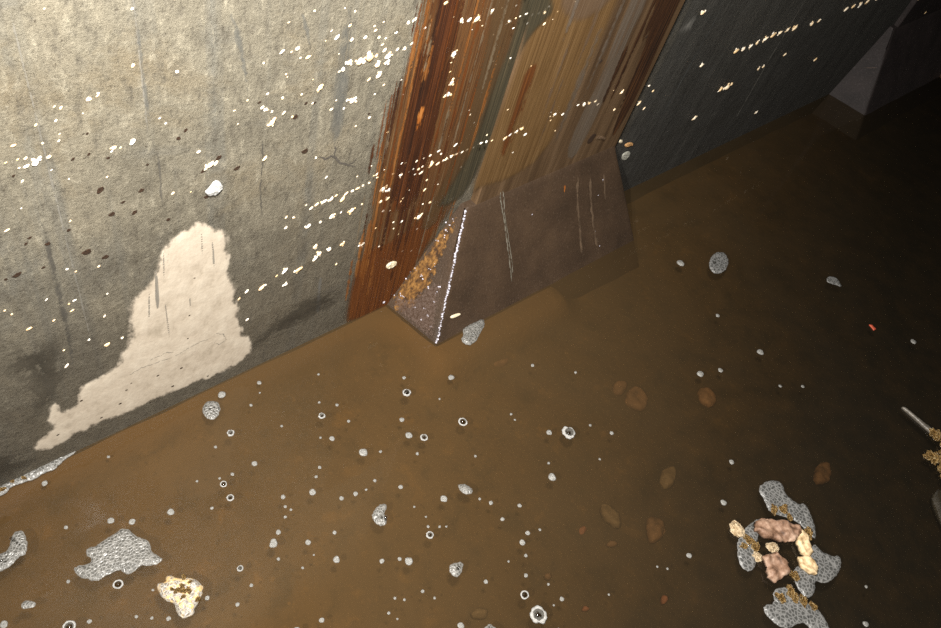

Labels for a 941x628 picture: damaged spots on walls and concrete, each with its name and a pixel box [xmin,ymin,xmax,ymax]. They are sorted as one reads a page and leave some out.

corrosion [345,0,523,335]
corrosion [475,0,616,188]
corrosion [598,0,680,135]
peeling [35,222,251,450]